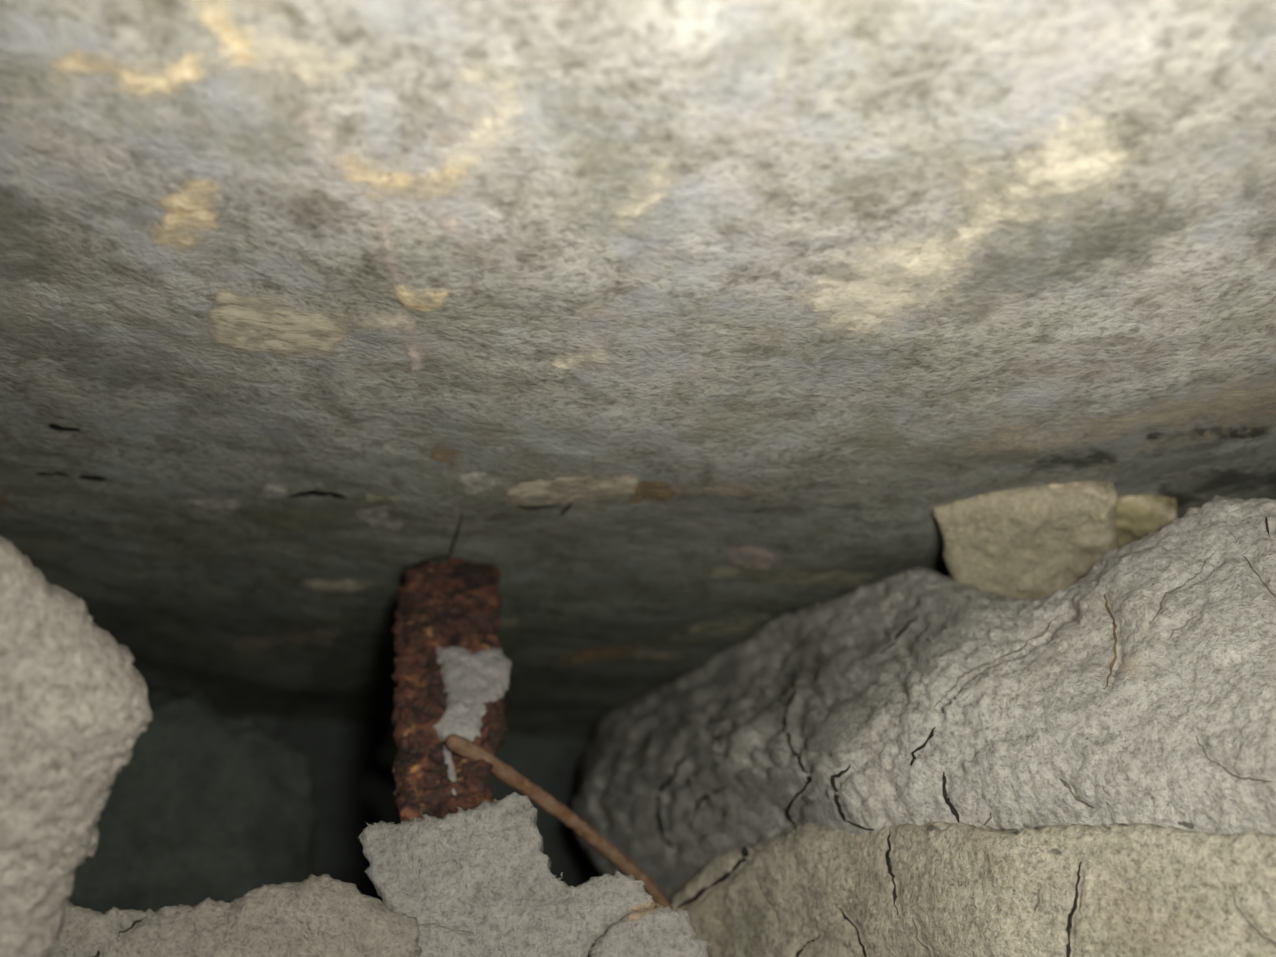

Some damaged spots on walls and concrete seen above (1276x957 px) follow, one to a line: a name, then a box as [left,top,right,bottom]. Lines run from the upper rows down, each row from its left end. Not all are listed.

crack [1151,552,1276,640]
crack [881,614,918,652]
crack [1104,594,1117,689]
crack [910,611,1069,766]
crack [1196,736,1275,783]
crack [942,772,992,825]
crack [1059,778,1095,808]
crack [1034,887,1042,912]
crack [1066,862,1082,957]